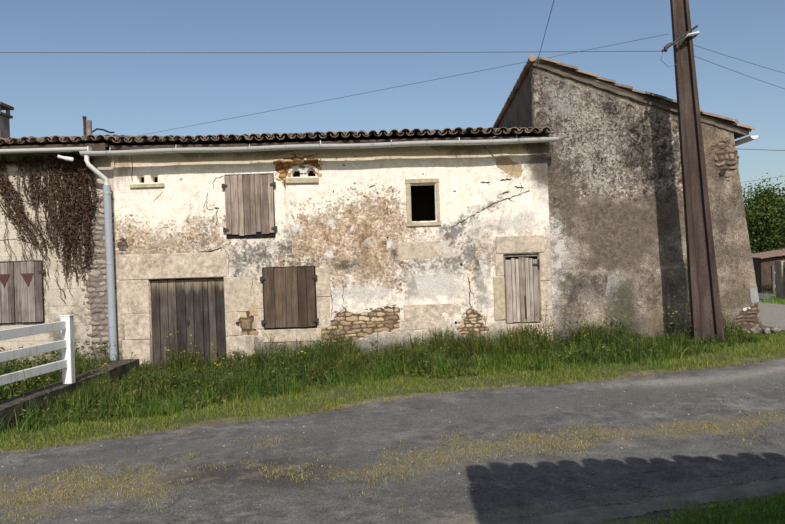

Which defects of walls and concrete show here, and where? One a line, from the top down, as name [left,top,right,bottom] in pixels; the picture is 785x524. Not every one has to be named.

flaking render [273,154,323,190]
flaking render [493,153,527,195]
crack [452,183,530,228]
flaking render [258,180,438,309]